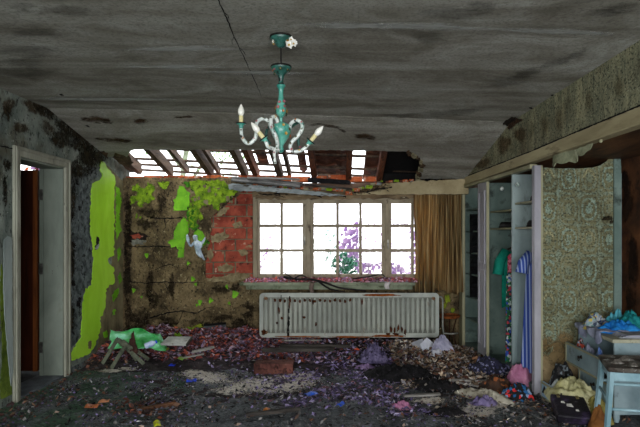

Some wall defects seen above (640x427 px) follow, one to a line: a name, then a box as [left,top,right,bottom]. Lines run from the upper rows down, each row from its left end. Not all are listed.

crack [218,0,262,97]
water stain [2,158,11,206]
water stain [0,98,28,133]
water stain [24,100,132,225]
peeling [71,151,148,361]
crack [127,217,215,325]
flaking render [168,185,253,317]